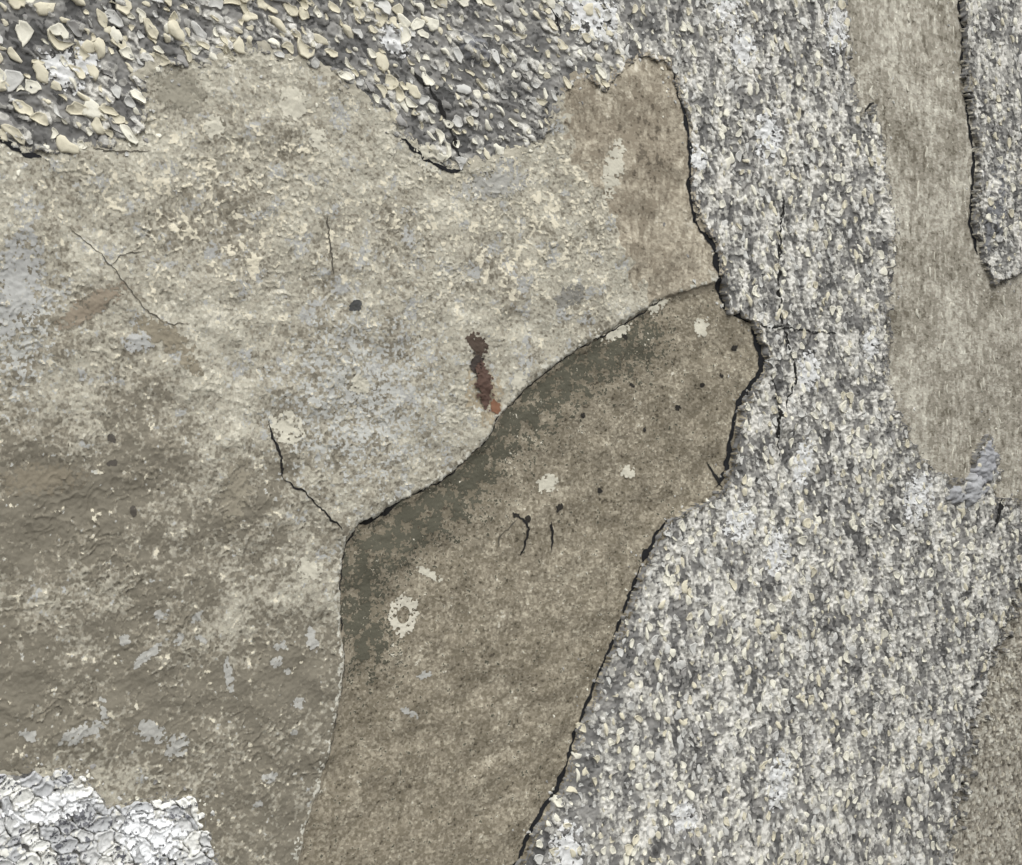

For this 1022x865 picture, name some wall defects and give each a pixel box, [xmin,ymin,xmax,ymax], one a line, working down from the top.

peeling [538,50,561,79]
peeling [967,0,1022,78]
peeling [42,98,67,125]
peeling [496,104,526,129]
peeling [691,170,732,208]
peeling [854,181,885,223]
rust [465,360,504,427]
peeling [835,389,867,425]
crack [269,300,661,765]
peeling [0,546,159,669]
crack [513,519,668,865]
peeling [34,703,256,808]